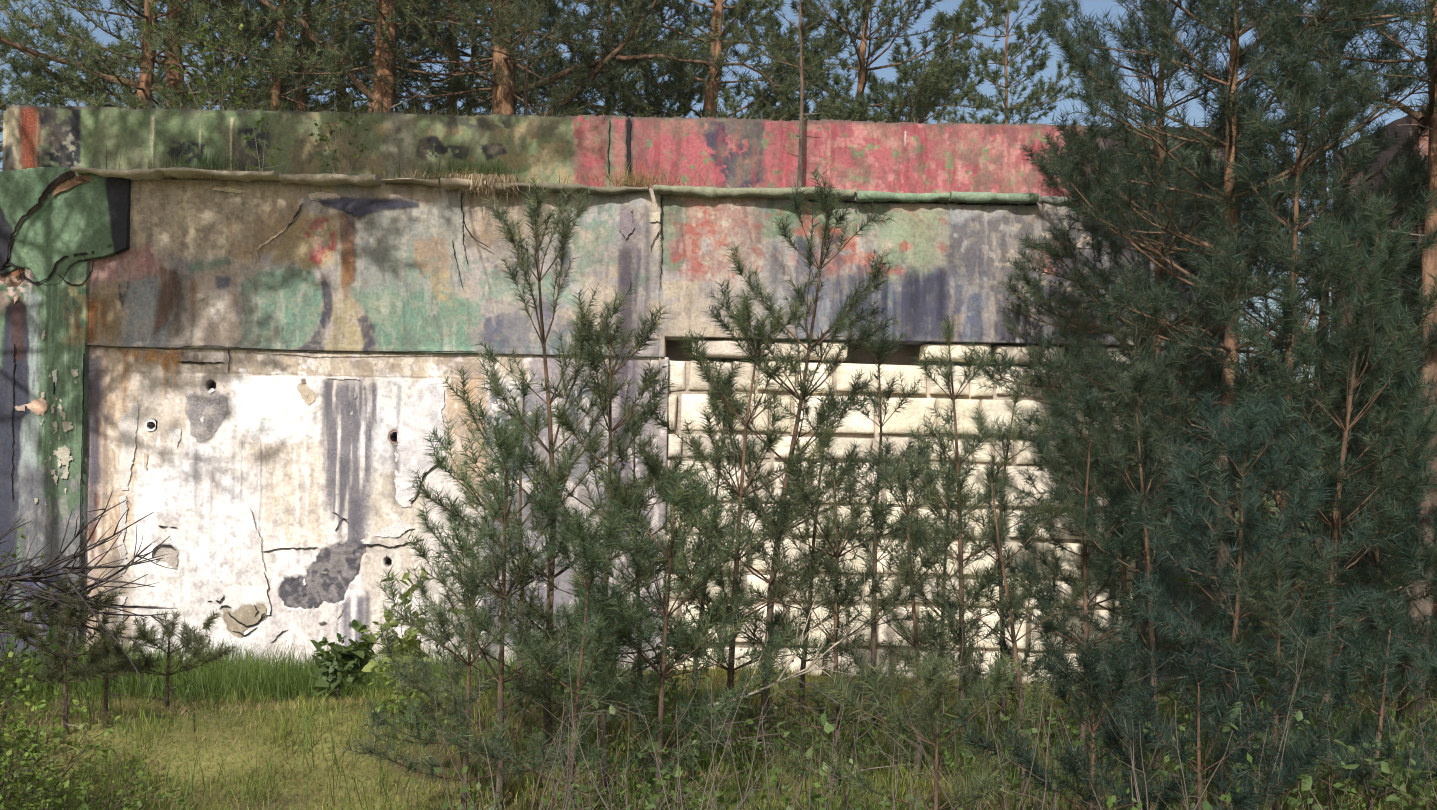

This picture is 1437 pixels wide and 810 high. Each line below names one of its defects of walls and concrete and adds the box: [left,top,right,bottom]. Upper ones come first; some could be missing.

crack [607,118,631,185]
crack [255,203,303,261]
crack [651,197,664,288]
crack [9,344,17,501]
peeling [15,365,78,493]
spalling [165,385,228,448]
crack [77,345,478,649]
spalling [297,378,316,406]
peeling [222,383,446,638]
peeling [327,376,365,415]
damp [324,381,376,544]
spalling [152,544,178,570]